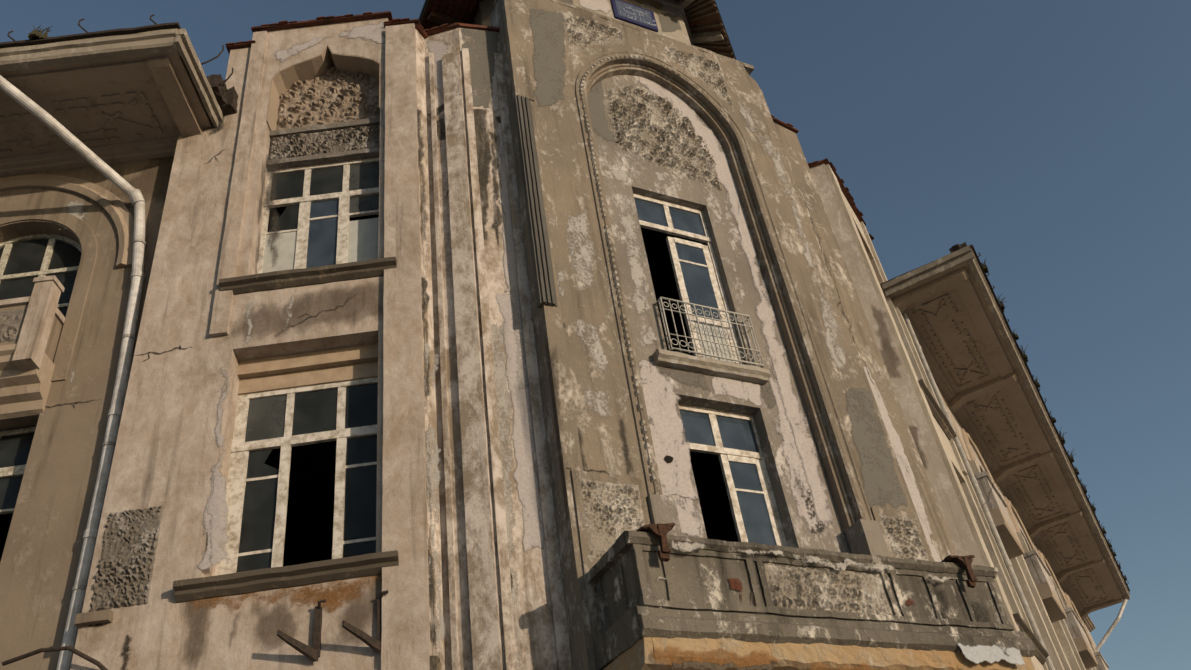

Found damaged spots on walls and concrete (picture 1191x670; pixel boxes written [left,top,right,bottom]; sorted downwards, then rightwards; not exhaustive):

peeling [556,213,597,297]
peeling [600,145,657,346]
crack [133,346,192,362]
crack [275,294,357,336]
peeling [576,320,608,371]
peeling [638,76,834,537]
peeling [584,385,610,417]
peeling [198,367,229,570]
peeling [863,366,941,562]
damp [188,602,207,660]